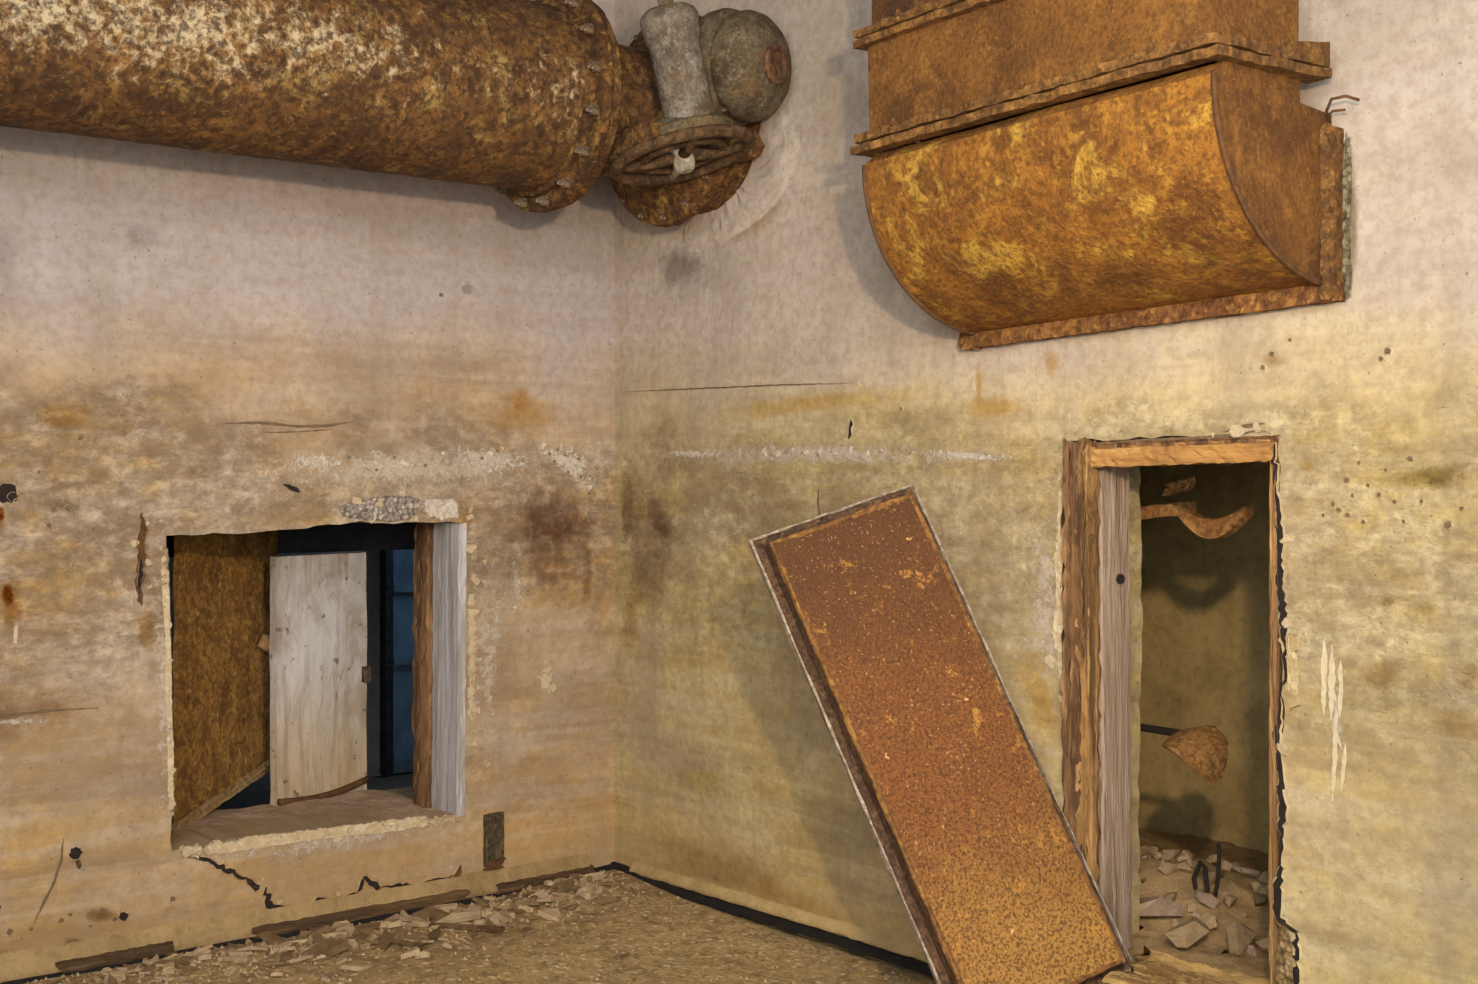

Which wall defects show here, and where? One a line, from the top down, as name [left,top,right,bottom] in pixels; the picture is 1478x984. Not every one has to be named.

spalling [338,496,473,530]
crack [129,512,153,606]
crack [0,707,94,725]
crack [180,852,463,909]